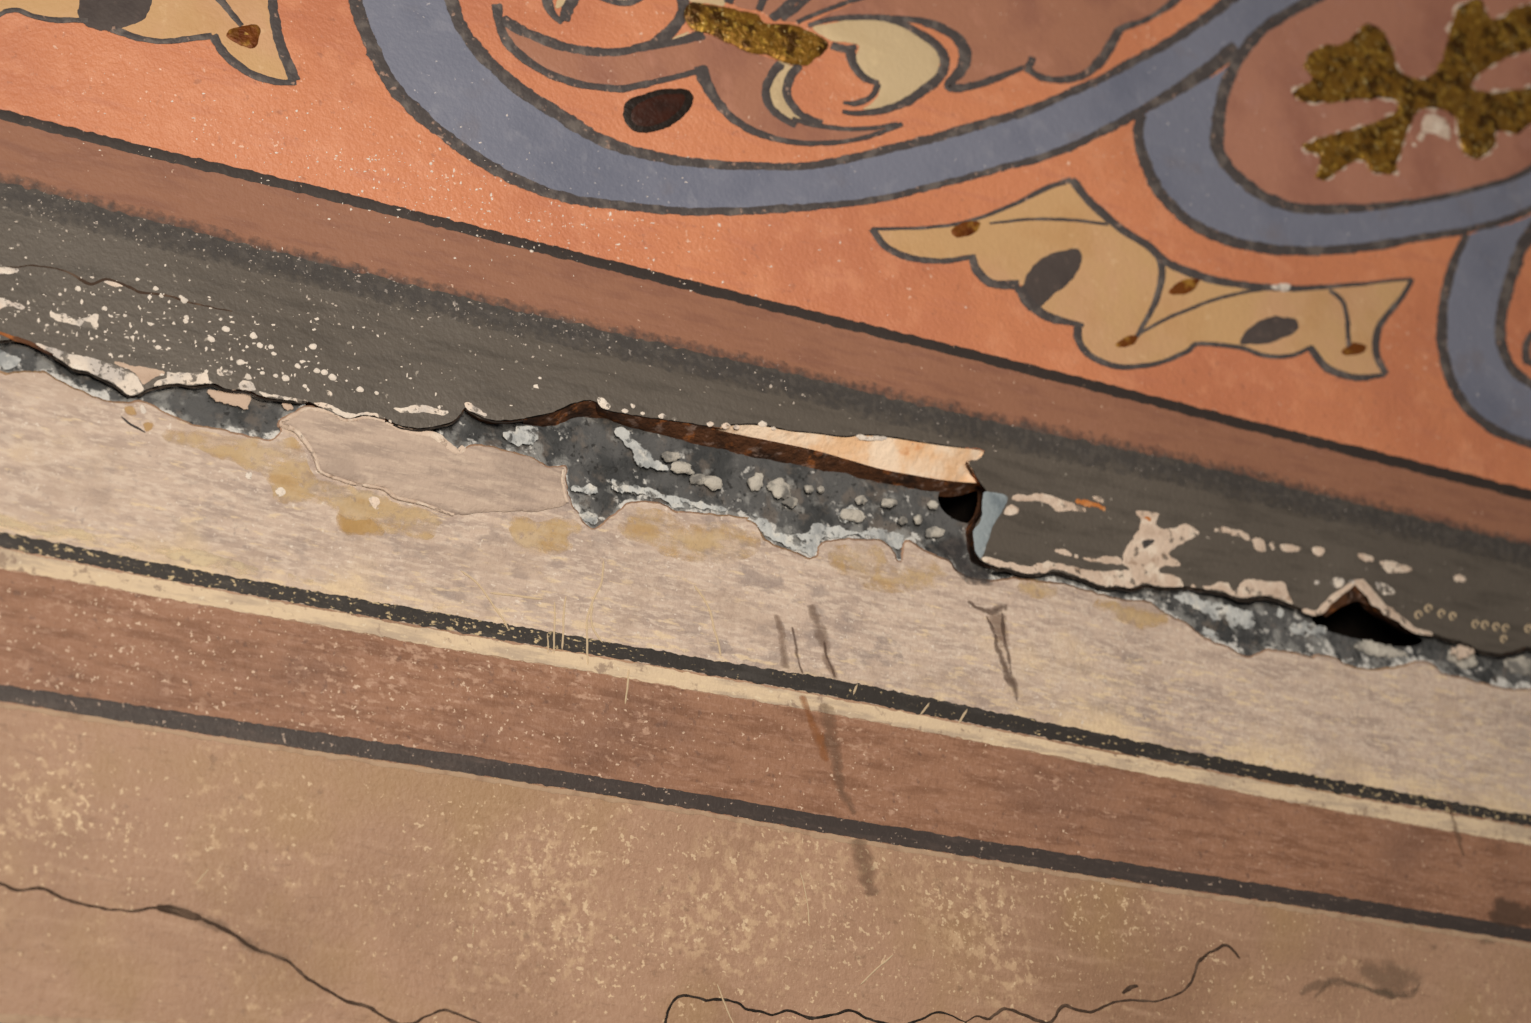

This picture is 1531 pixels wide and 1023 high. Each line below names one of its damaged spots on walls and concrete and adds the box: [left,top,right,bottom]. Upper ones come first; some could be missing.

peeling [222,83,657,287]
flaking render [0,192,1531,689]
leakage [969,602,1016,692]
crack [0,882,481,1023]
crack [664,944,1240,1023]